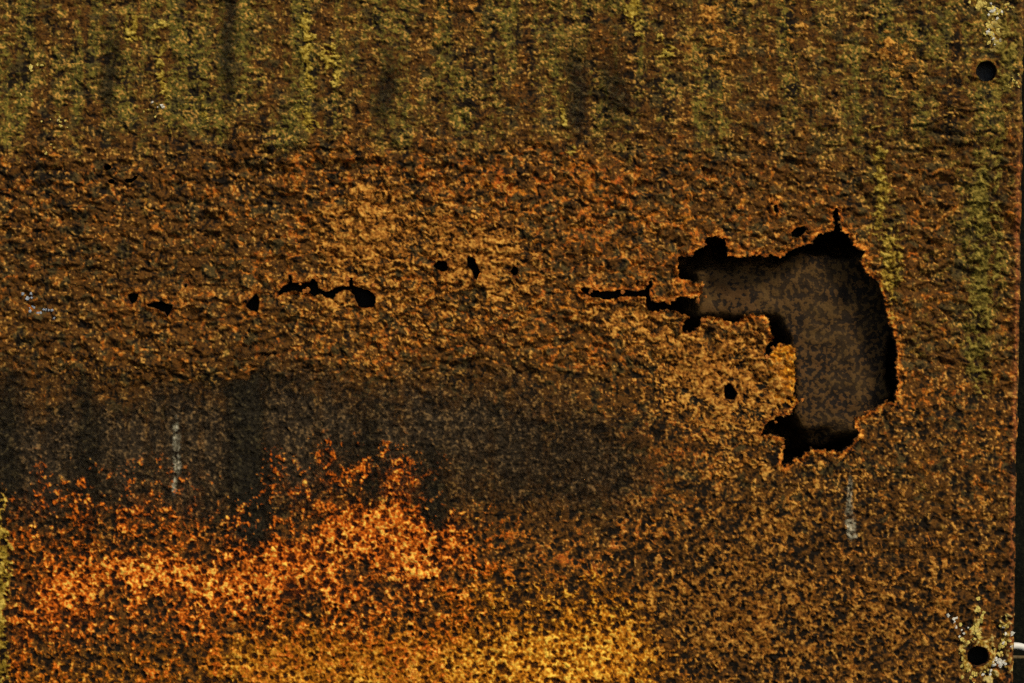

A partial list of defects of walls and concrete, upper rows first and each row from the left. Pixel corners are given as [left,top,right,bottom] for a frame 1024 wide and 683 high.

leakage [154,19,171,98]
leakage [296,0,344,134]
leakage [621,0,644,45]
rust [698,0,739,114]
rust [870,21,924,96]
spalling [129,293,173,316]
rust [261,147,555,376]
spalling [467,256,480,279]
crack [575,275,662,314]
spalling [724,383,737,400]
leakage [0,361,626,683]
rust [1,295,961,683]